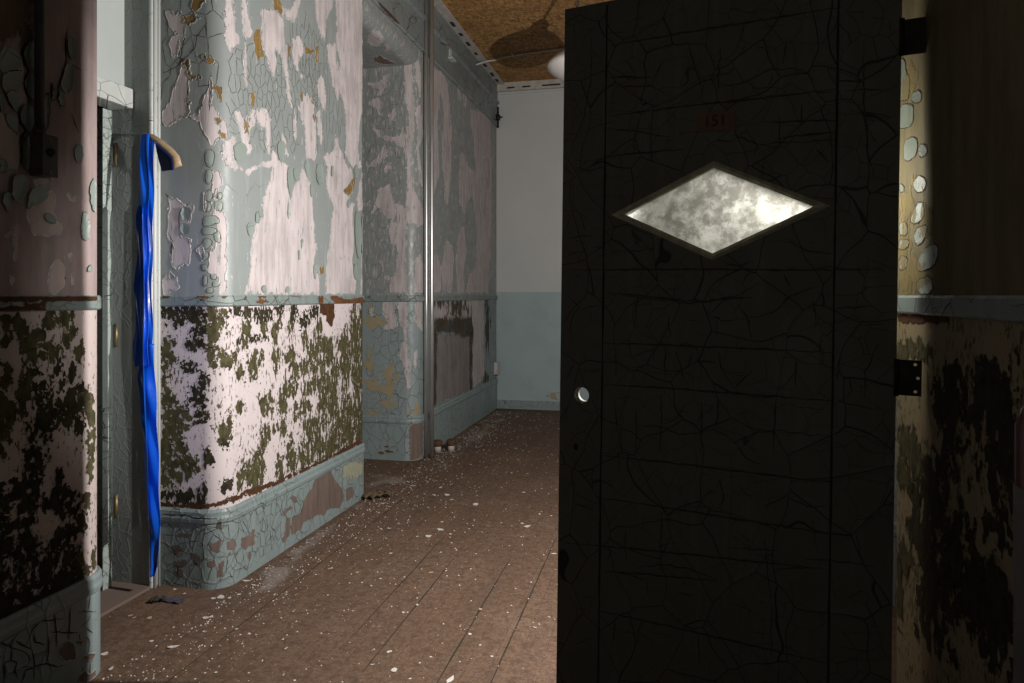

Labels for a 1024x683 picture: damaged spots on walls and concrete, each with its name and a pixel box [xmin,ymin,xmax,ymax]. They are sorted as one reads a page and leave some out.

peeling [0,37,97,241]
peeling [900,58,927,162]
peeling [47,258,67,295]
peeling [162,0,492,404]
corrosion [319,296,365,327]
peeling [899,175,938,295]
damp [161,300,491,509]
spalling [408,422,423,461]
crack [160,481,310,588]
damp [896,335,1019,683]
crack [0,600,96,683]